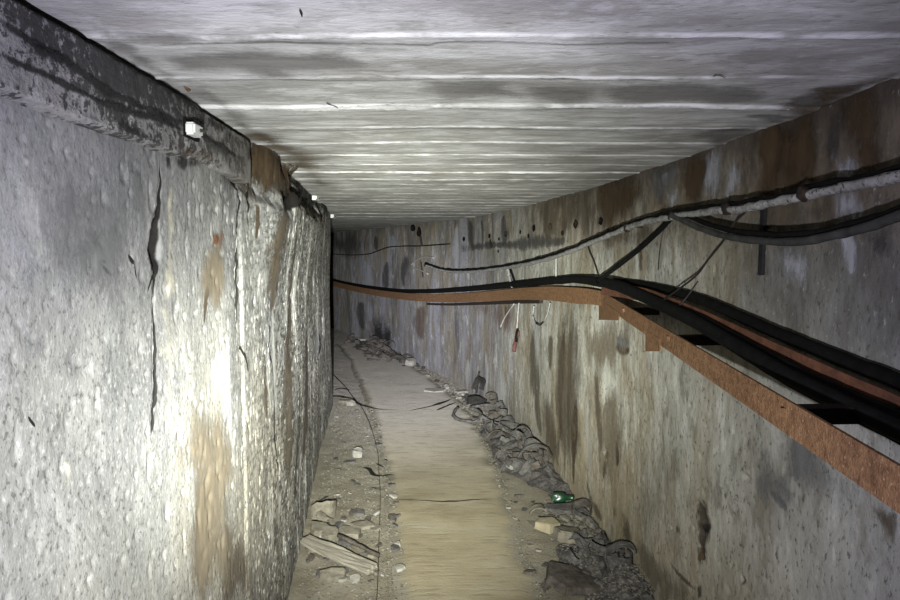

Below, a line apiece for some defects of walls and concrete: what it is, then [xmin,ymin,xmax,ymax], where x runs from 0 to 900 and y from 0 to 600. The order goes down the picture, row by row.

water stain [785,81,881,177]
water stain [684,130,749,199]
crack [128,168,174,432]
corrosion [201,234,224,323]
water stain [335,233,389,288]
water stain [357,301,398,352]
water stain [452,178,641,282]
efflorescence [784,255,806,280]
efflorescence [841,236,856,274]
water stain [485,353,506,409]
water stain [530,316,627,483]
water stain [640,546,690,600]